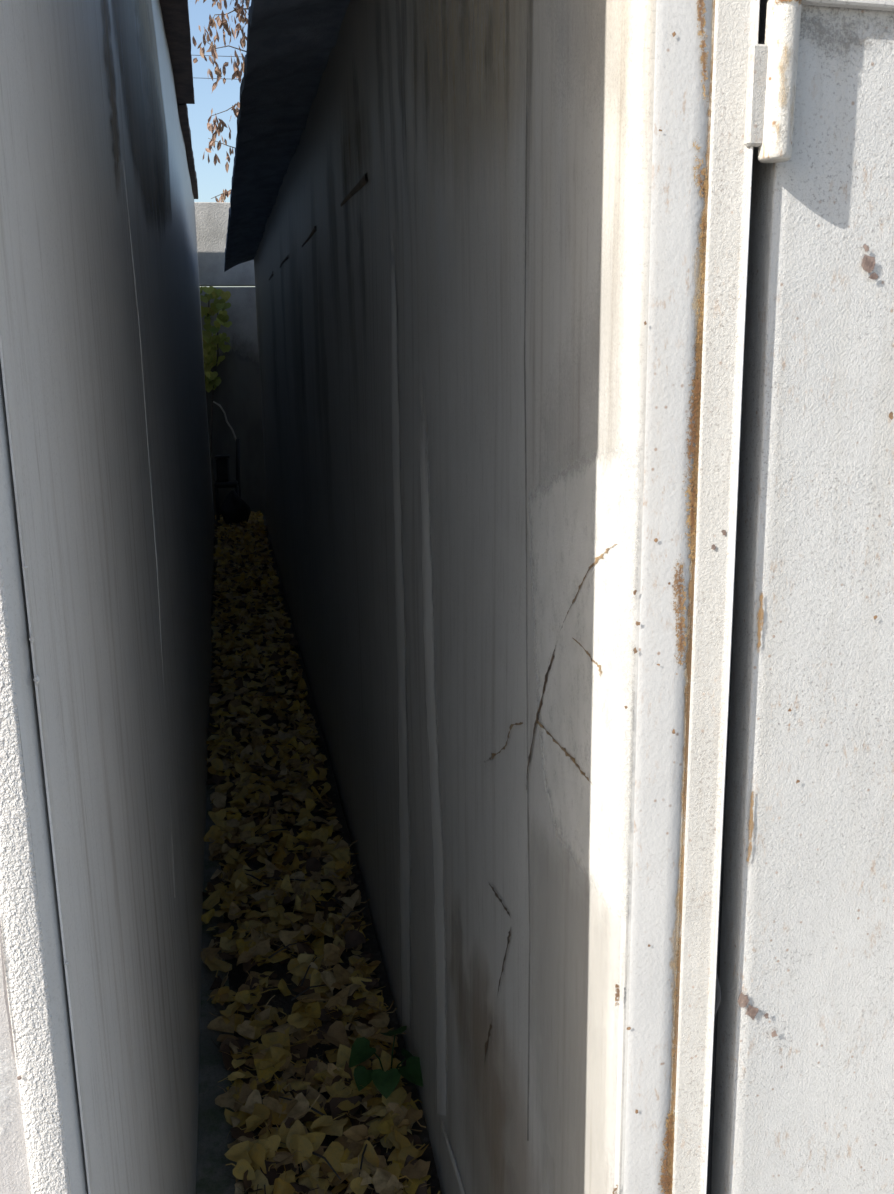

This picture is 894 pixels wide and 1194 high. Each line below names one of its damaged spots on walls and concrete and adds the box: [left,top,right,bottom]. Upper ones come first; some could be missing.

crack [489,544,617,781]
corrosion [659,0,715,1194]
crack [489,883,511,994]
corrosion [738,992,778,1037]